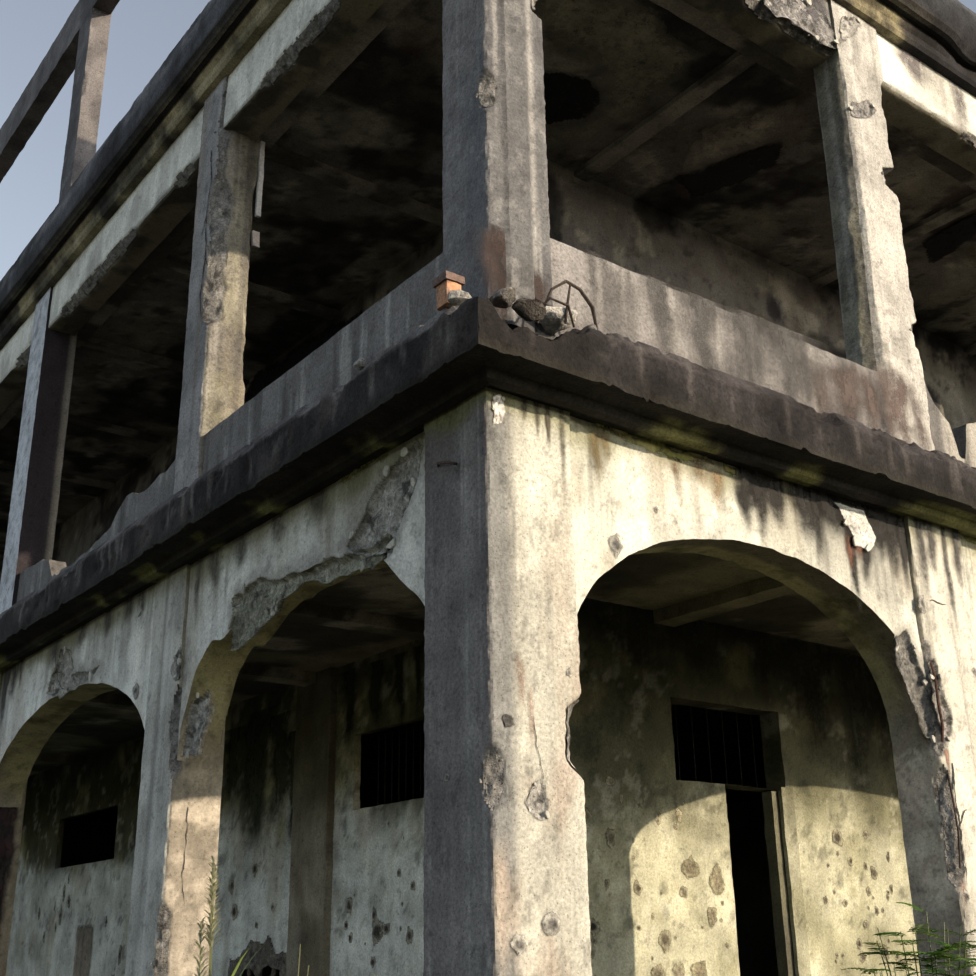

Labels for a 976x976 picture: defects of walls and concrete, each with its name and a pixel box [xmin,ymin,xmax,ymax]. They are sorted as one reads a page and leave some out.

spalling [745,0,861,56]
damp [543,72,601,126]
spalling [203,90,232,324]
damp [674,144,783,197]
damp [648,276,673,353]
damp [687,291,811,401]
spalling [228,440,423,651]
damp [736,466,961,609]
flaking render [835,502,876,552]
spalling [168,644,215,779]
damp [225,707,296,834]
spalling [892,630,970,903]